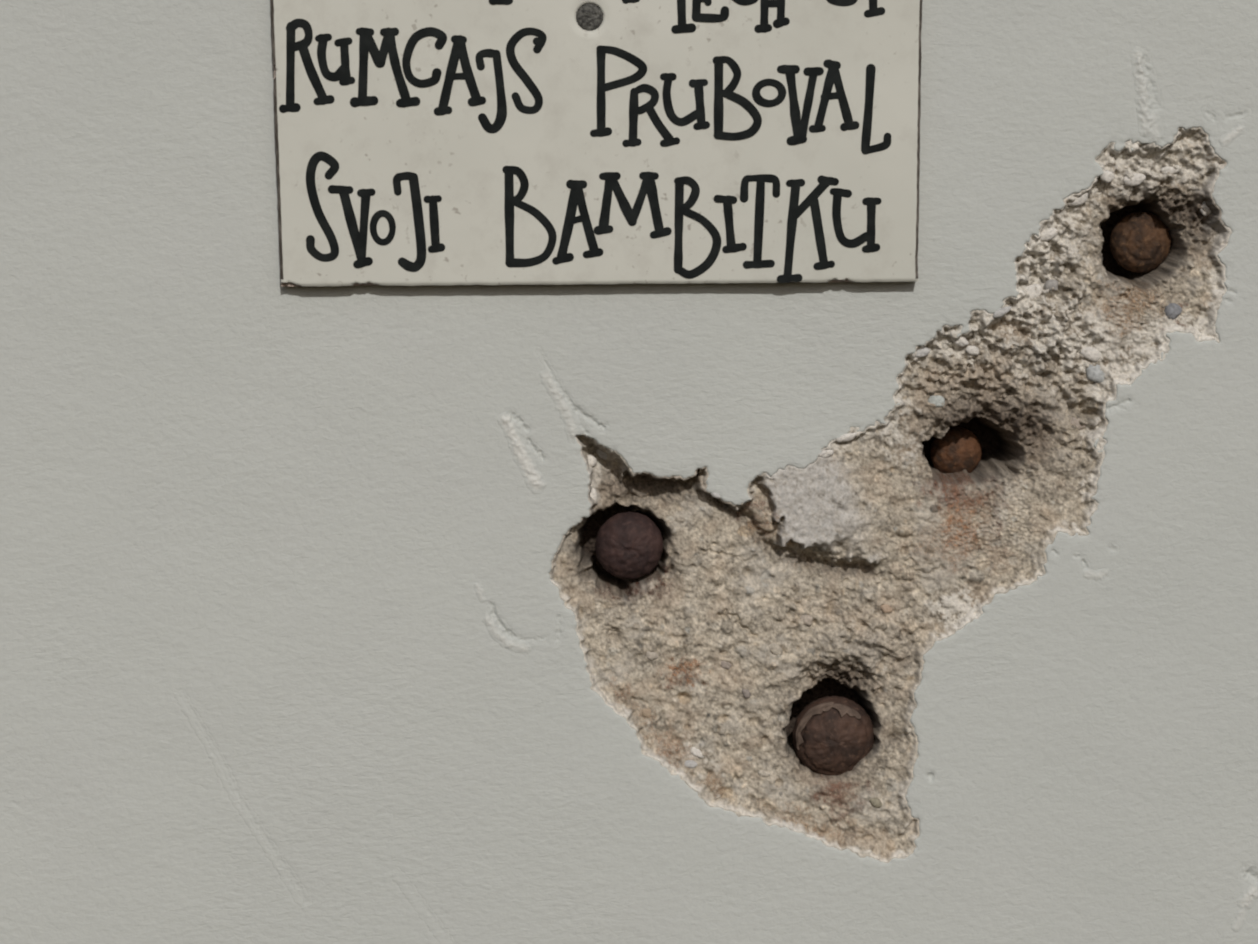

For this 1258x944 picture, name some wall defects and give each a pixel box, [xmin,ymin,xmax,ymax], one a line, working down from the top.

corrosion [795,702,861,750]
flaking render [473,127,1240,863]